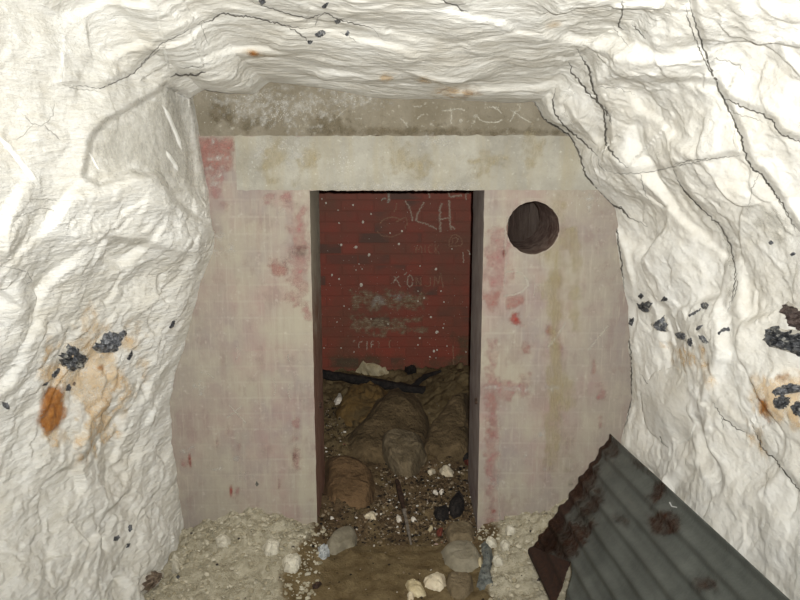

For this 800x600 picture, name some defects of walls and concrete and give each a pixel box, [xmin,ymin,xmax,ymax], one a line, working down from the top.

crack [16,1,378,141]
crack [535,0,800,309]
corrosion [39,344,131,449]
crack [624,337,648,433]